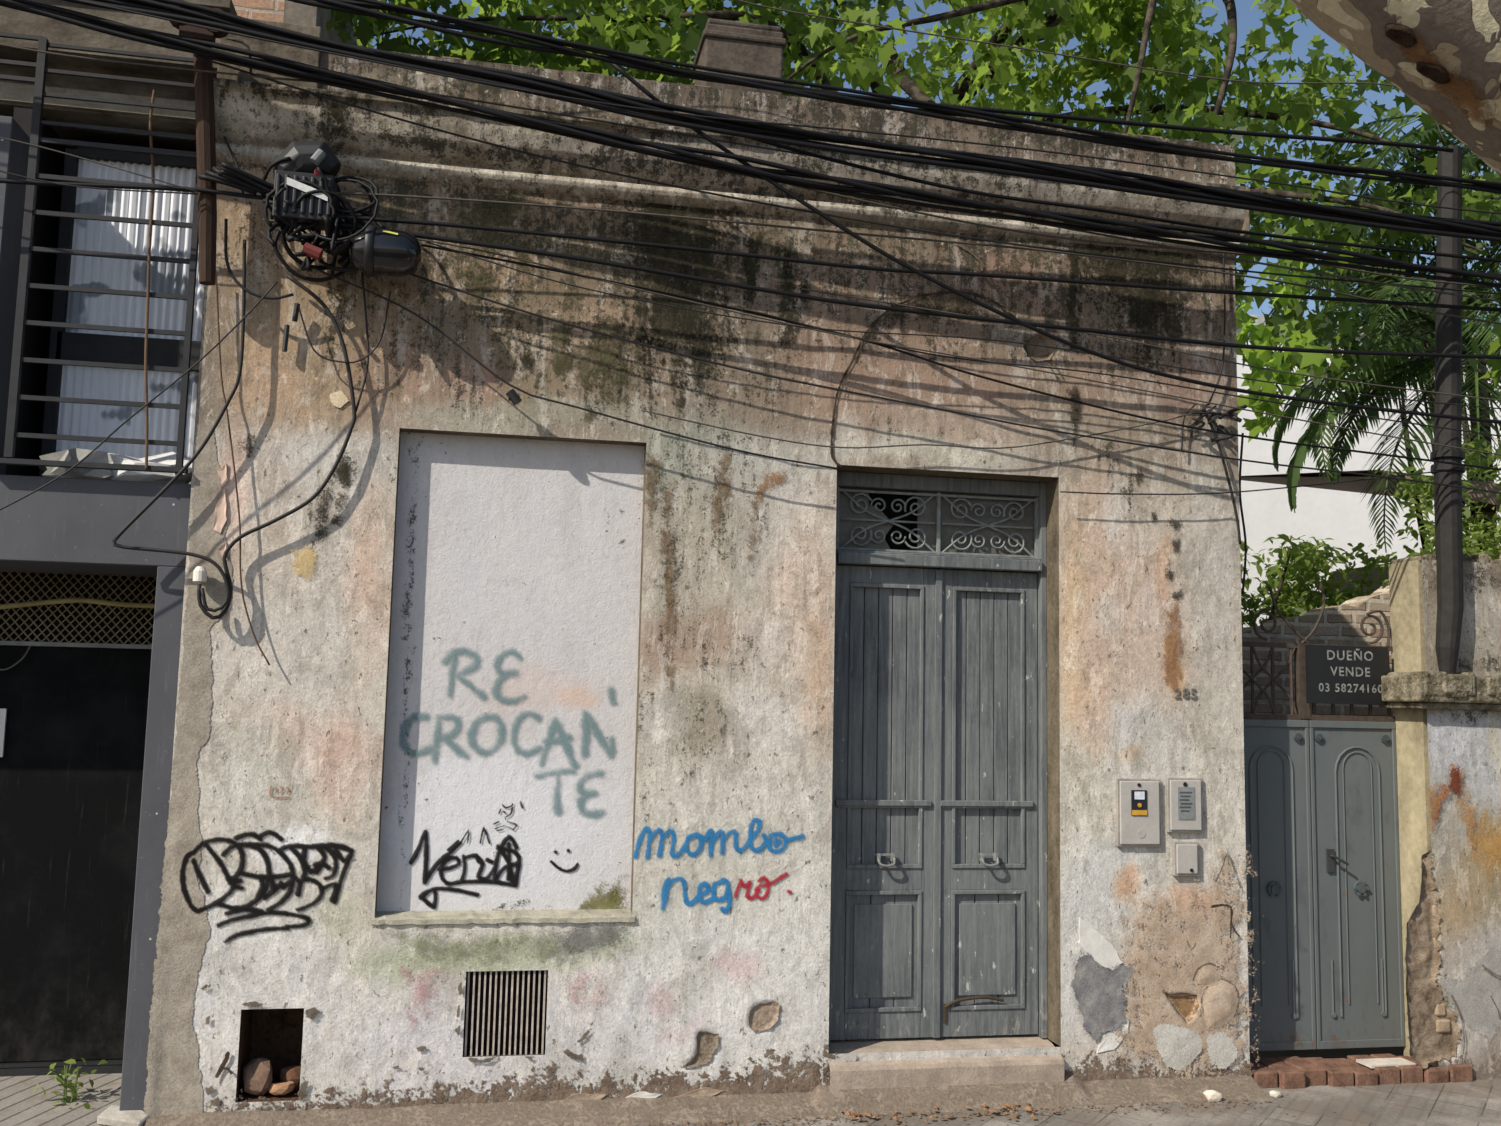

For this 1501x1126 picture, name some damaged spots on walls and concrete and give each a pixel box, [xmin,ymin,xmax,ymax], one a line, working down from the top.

damp [312,89,364,151]
mould [449,188,550,325]
damp [519,200,810,423]
damp [1064,244,1216,387]
damp [1065,384,1082,449]
rust [1162,539,1185,691]
peeling [143,425,858,1117]
rust [1427,763,1501,895]
flaking render [1062,841,1260,1082]
flaking render [1405,849,1461,1069]